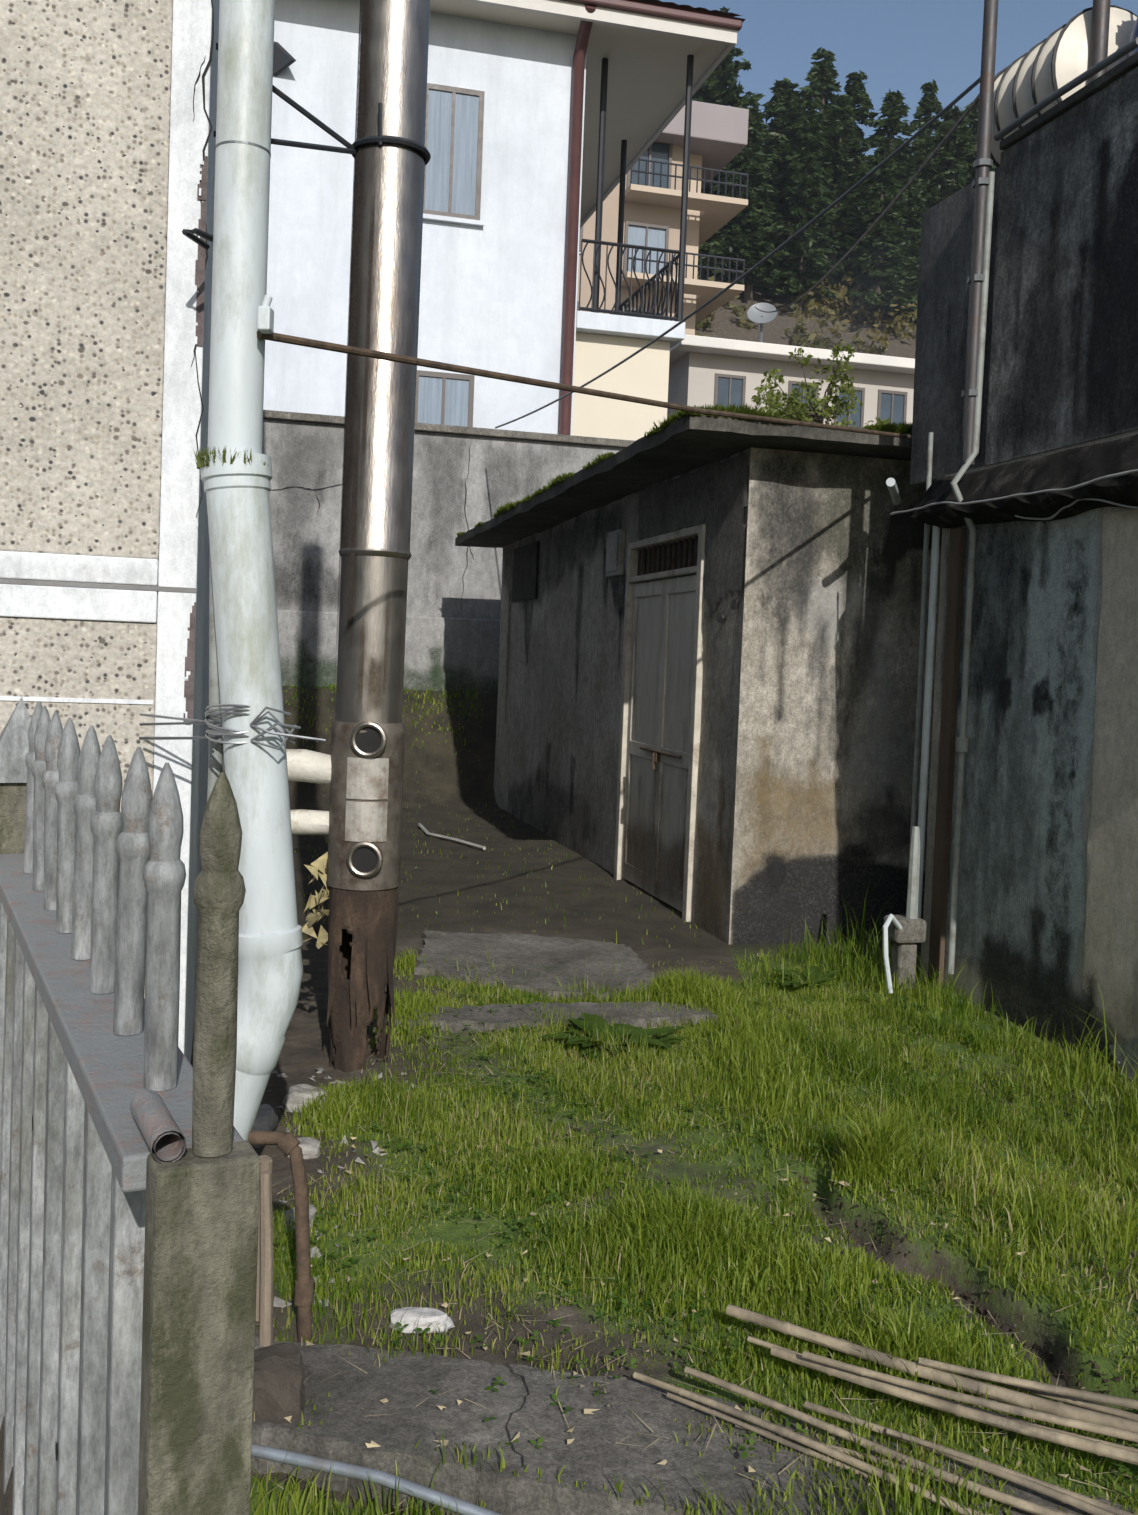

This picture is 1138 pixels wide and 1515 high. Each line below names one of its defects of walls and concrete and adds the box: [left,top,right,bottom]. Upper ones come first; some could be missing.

damp [947,140,1138,459]
damp [505,510,626,693]
damp [696,455,1118,1075]
corrosion [327,939,365,1027]